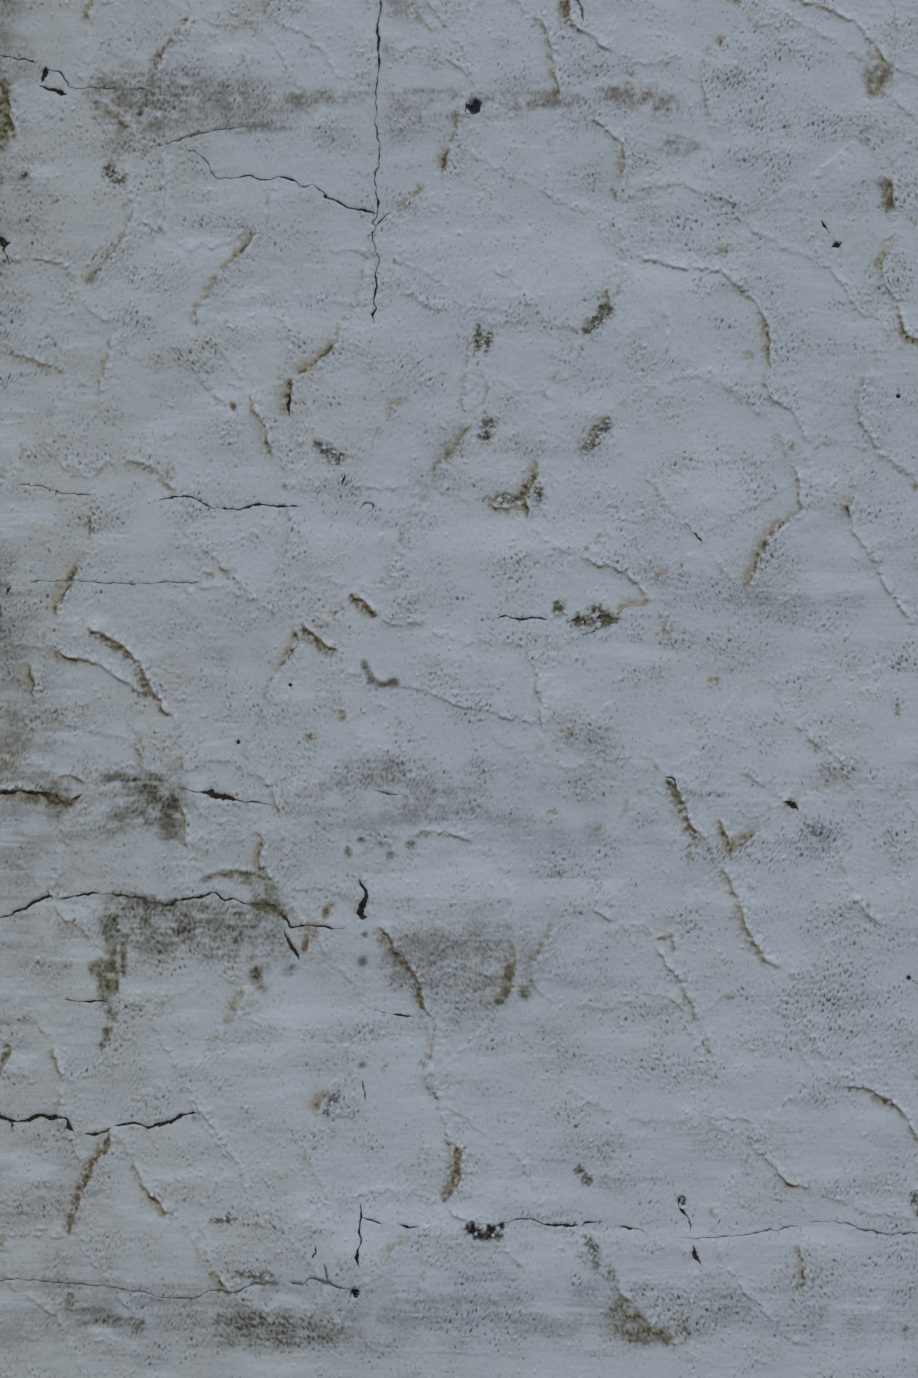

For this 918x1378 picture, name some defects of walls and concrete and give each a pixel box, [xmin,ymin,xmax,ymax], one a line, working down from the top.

crack [0,55,147,96]
crack [166,0,389,321]
crack [160,495,303,510]
crack [179,787,271,805]
crack [0,879,368,960]
water stain [234,887,284,916]
water stain [89,959,117,1047]
water stain [486,965,528,1004]
crack [0,1111,199,1136]
crack [504,1218,646,1234]
crack [674,1193,916,1264]
crack [0,1205,419,1299]